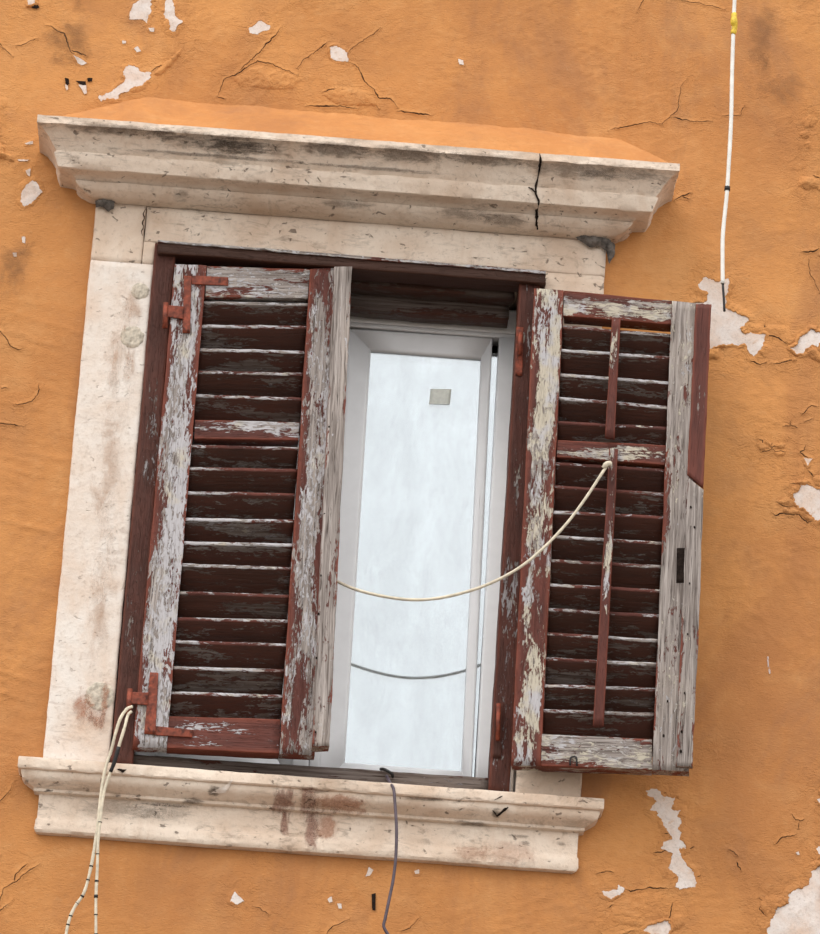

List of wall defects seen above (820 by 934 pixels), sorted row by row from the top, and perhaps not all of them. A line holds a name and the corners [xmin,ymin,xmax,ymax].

crack [0,22,89,59]
peeling [65,39,156,106]
peeling [126,0,189,37]
crack [214,25,432,118]
crack [528,153,542,230]
peeling [682,271,772,363]
peeling [788,456,820,526]
peeling [641,781,705,896]
crack [0,852,42,915]
crack [595,867,681,934]
peeling [637,917,674,934]
peeling [760,837,820,934]